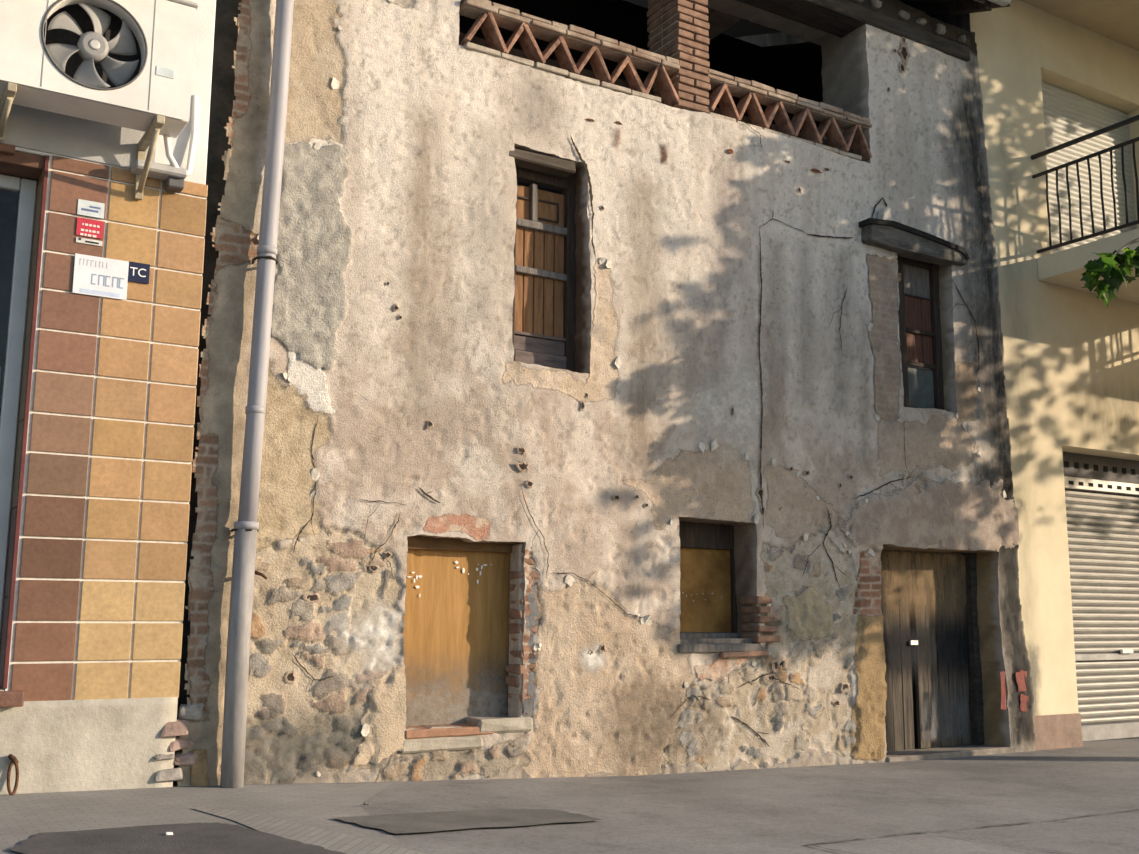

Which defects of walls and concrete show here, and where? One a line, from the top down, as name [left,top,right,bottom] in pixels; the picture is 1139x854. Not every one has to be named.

flaking render [222,0,252,161]
peeling [285,0,347,150]
peeling [502,257,622,411]
crack [758,213,853,528]
water stain [958,64,1015,505]
flaking render [154,217,259,786]
crack [520,485,643,618]
peeling [613,439,839,541]
crack [803,509,847,584]
crack [855,422,913,499]
peeling [517,550,756,778]
water stain [998,544,1034,741]